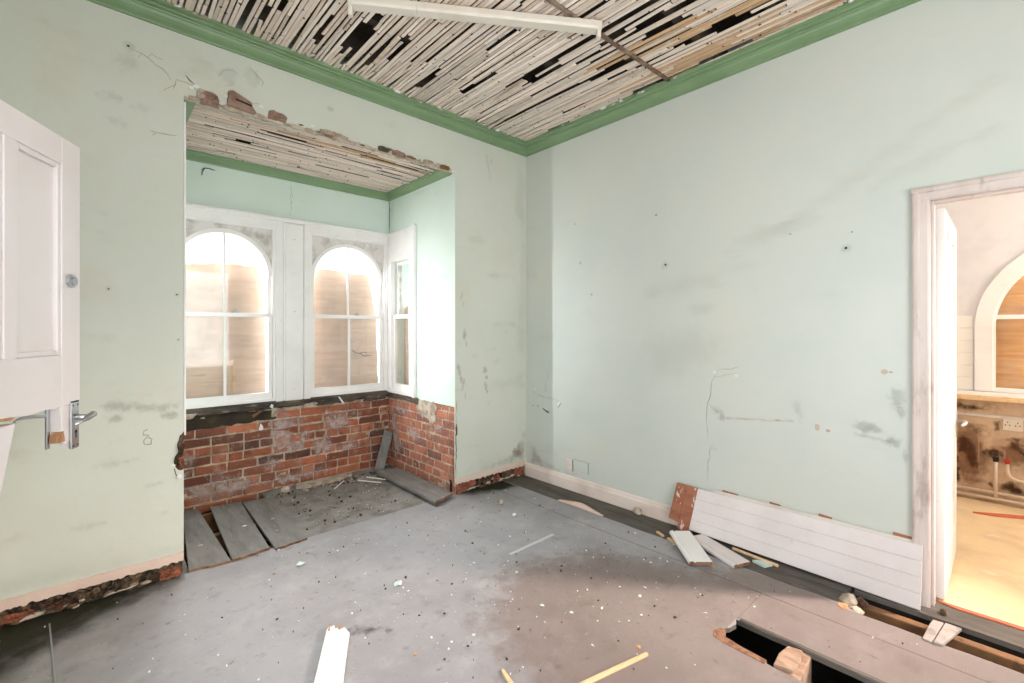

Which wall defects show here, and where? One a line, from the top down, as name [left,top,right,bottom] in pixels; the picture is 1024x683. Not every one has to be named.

flaking render [185,75,454,173]
spalling [450,402,525,495]
water stain [957,425,1024,494]
spalling [0,552,183,628]